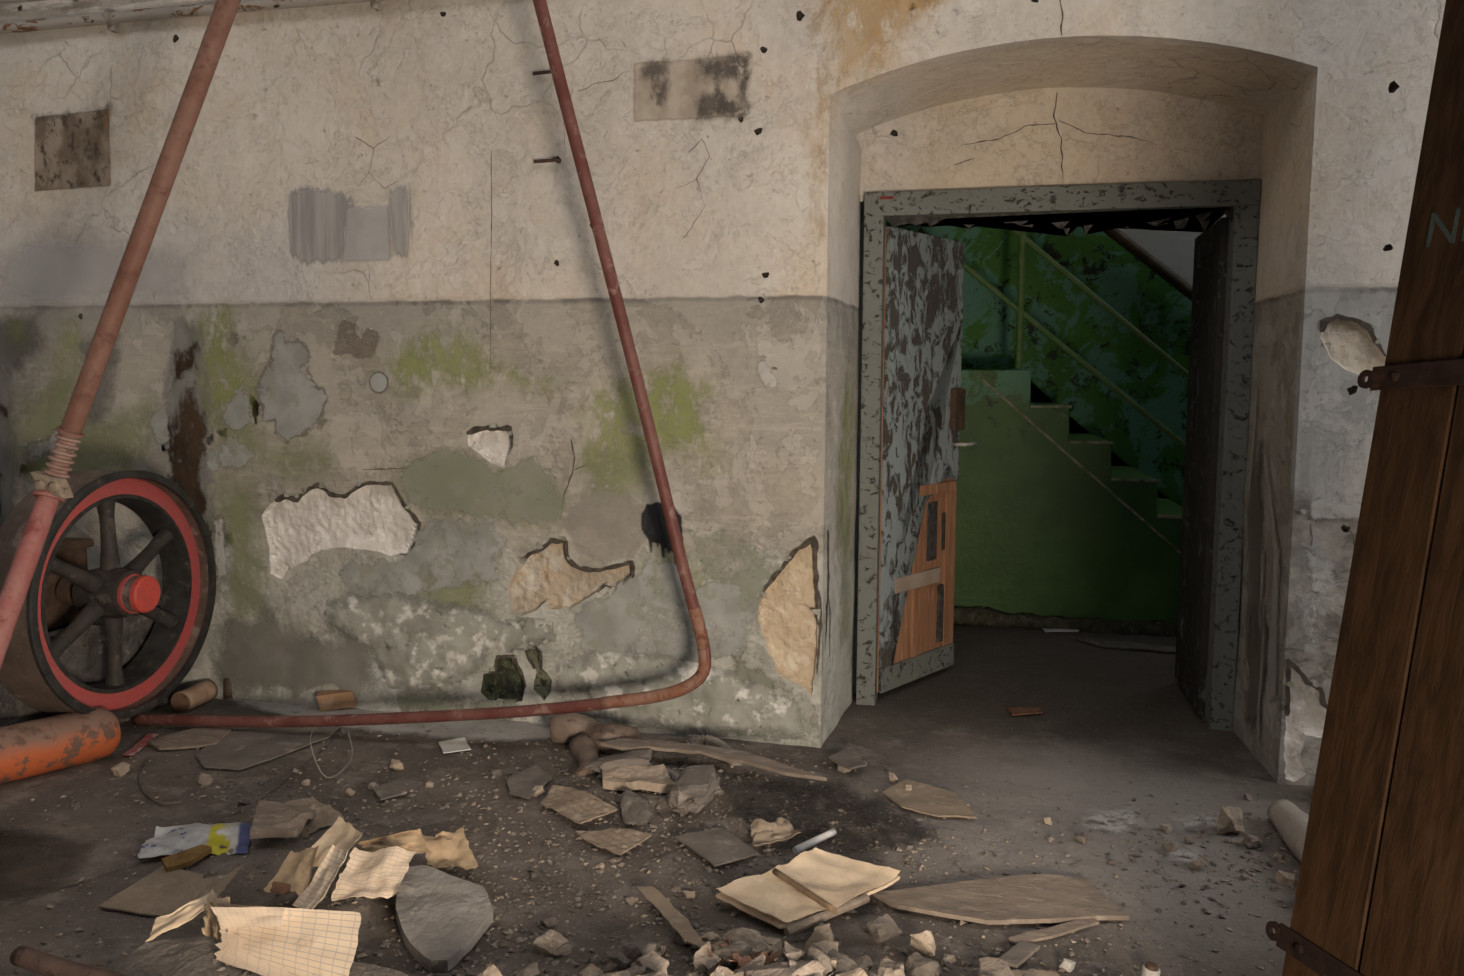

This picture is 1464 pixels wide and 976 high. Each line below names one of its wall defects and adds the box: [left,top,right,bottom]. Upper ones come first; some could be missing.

rust [834,0,930,60]
flaking render [1320,314,1386,395]
damp [0,320,38,527]
damp [165,322,216,537]
peeling [206,329,327,472]
flaking render [466,422,513,468]
peeling [1301,500,1361,532]
peeling [262,481,821,696]
peeling [1244,384,1328,782]
damp [231,657,551,741]
flaking render [397,641,552,721]